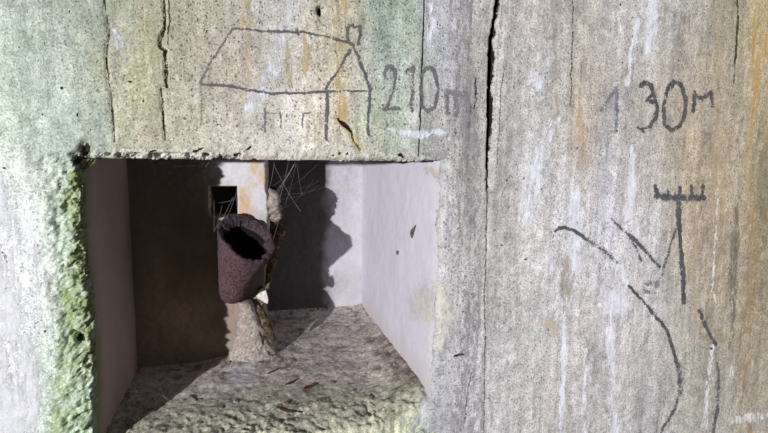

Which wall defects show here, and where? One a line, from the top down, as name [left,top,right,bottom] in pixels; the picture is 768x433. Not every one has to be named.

crack [103,0,115,143]
crack [157,0,171,141]
corrosion [305,0,352,148]
crack [464,0,505,431]
leakage [517,0,562,241]
leakage [536,183,583,433]
leakage [595,259,632,433]
leakage [623,144,639,221]
leakage [623,0,659,88]
leakage [701,343,715,429]
leakage [726,205,741,351]
crack [732,0,740,85]